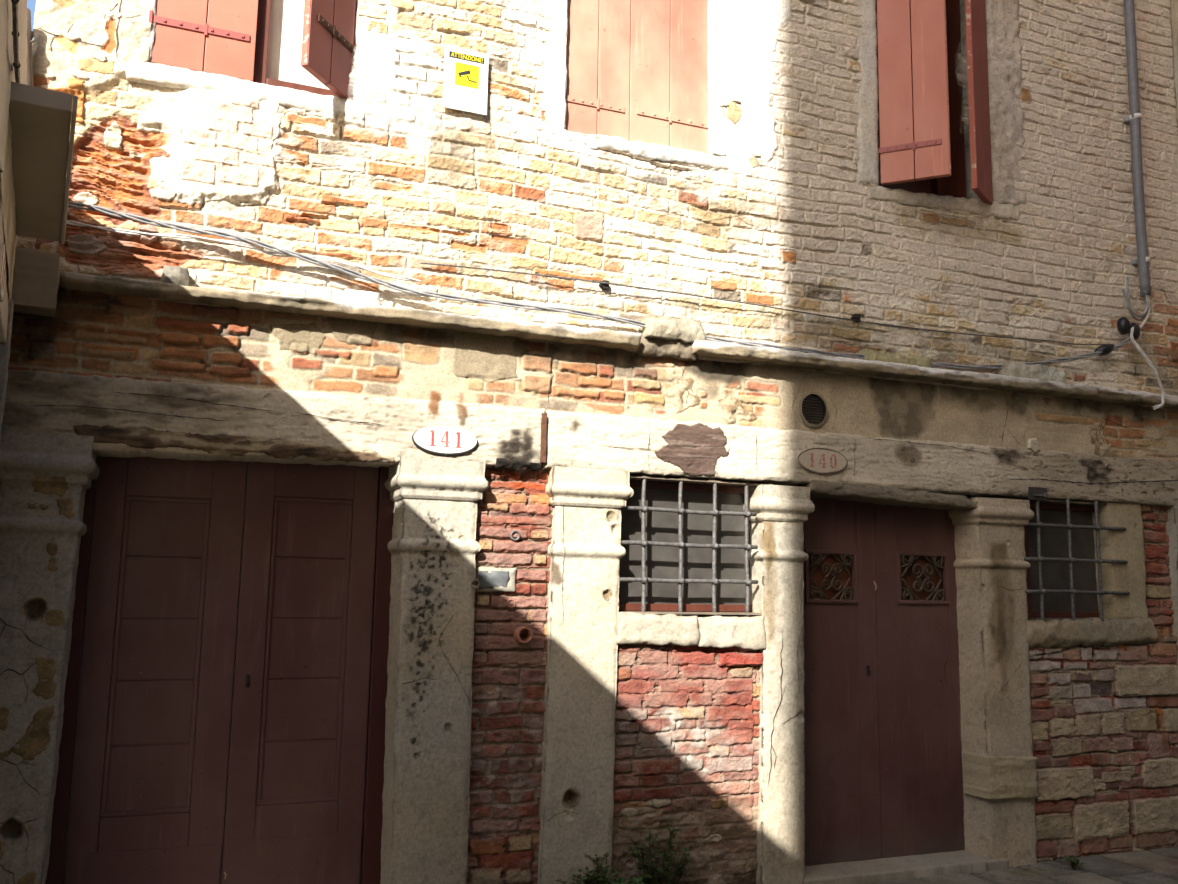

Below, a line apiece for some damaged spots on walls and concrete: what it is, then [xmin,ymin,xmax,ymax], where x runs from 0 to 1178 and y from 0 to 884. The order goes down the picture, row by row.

flaking render [54,0,75,9]
flaking render [33,11,123,89]
spalling [35,116,204,275]
peeling [229,190,260,207]
damp [870,378,935,437]
flaking render [26,472,76,520]
spalling [20,595,65,626]
damp [408,514,453,707]
flaking render [0,657,57,760]
crack [767,635,801,789]
spalling [0,815,27,860]